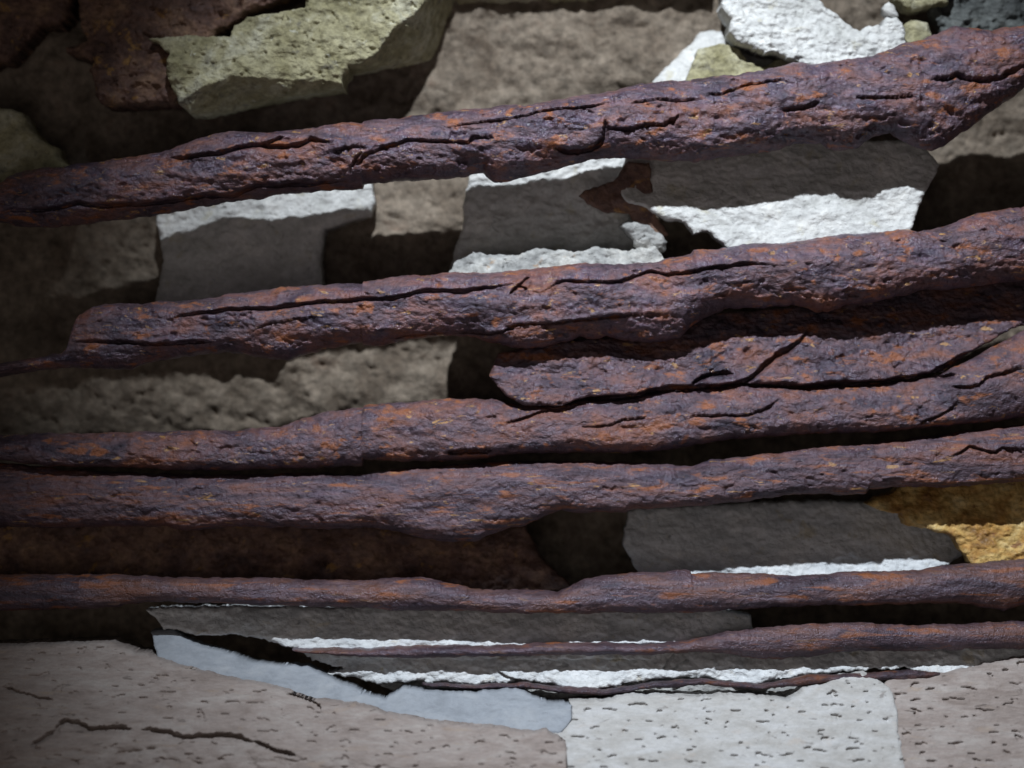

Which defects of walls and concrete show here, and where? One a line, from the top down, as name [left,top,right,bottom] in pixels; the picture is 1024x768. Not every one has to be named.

rust [864,482,1024,564]